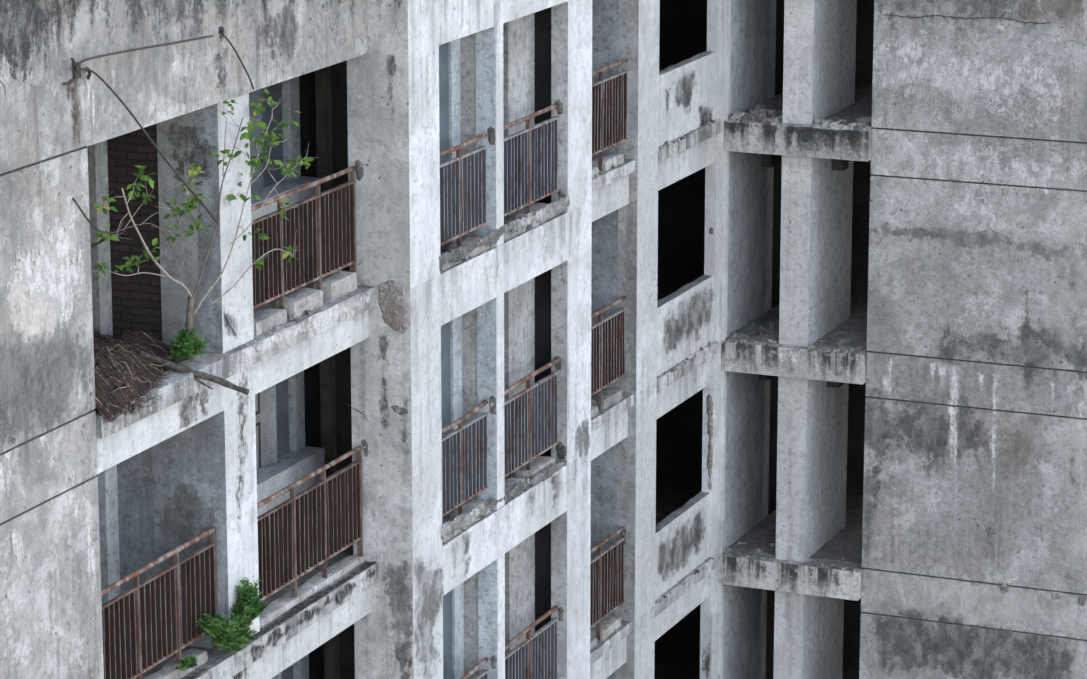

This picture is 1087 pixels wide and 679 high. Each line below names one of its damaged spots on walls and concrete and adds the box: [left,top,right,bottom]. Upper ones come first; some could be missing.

damp [0,0,299,86]
crack [882,11,1053,24]
damp [666,72,695,110]
spalling [439,189,570,270]
spalling [243,280,410,362]
damp [862,315,1087,551]
damp [659,512,705,581]
damp [875,608,1076,679]